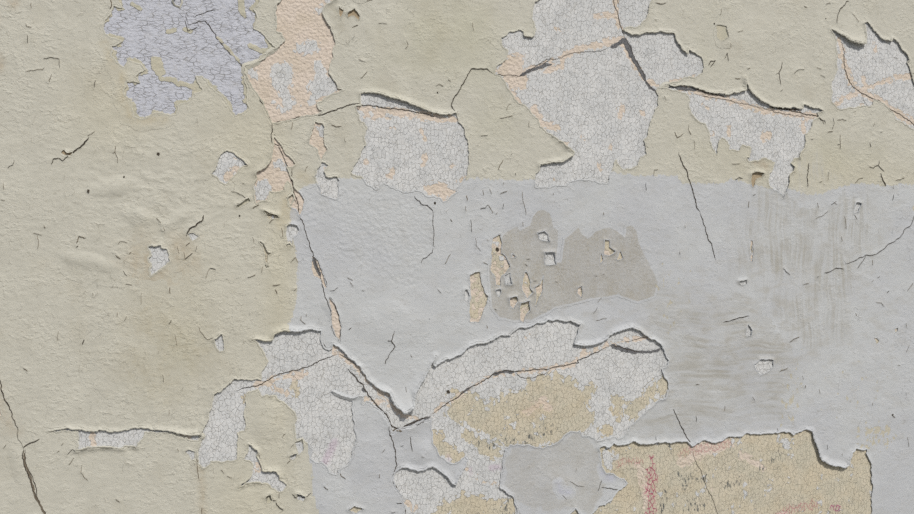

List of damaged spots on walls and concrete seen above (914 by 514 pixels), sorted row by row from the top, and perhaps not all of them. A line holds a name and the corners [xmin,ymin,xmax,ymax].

crack [185,10,247,78]
peeling [210,0,471,249]
crack [231,99,662,514]
peeling [45,231,874,514]
crack [438,0,914,201]
crack [675,128,716,259]
crack [673,409,718,514]
peeling [493,0,914,199]
crack [784,218,914,306]